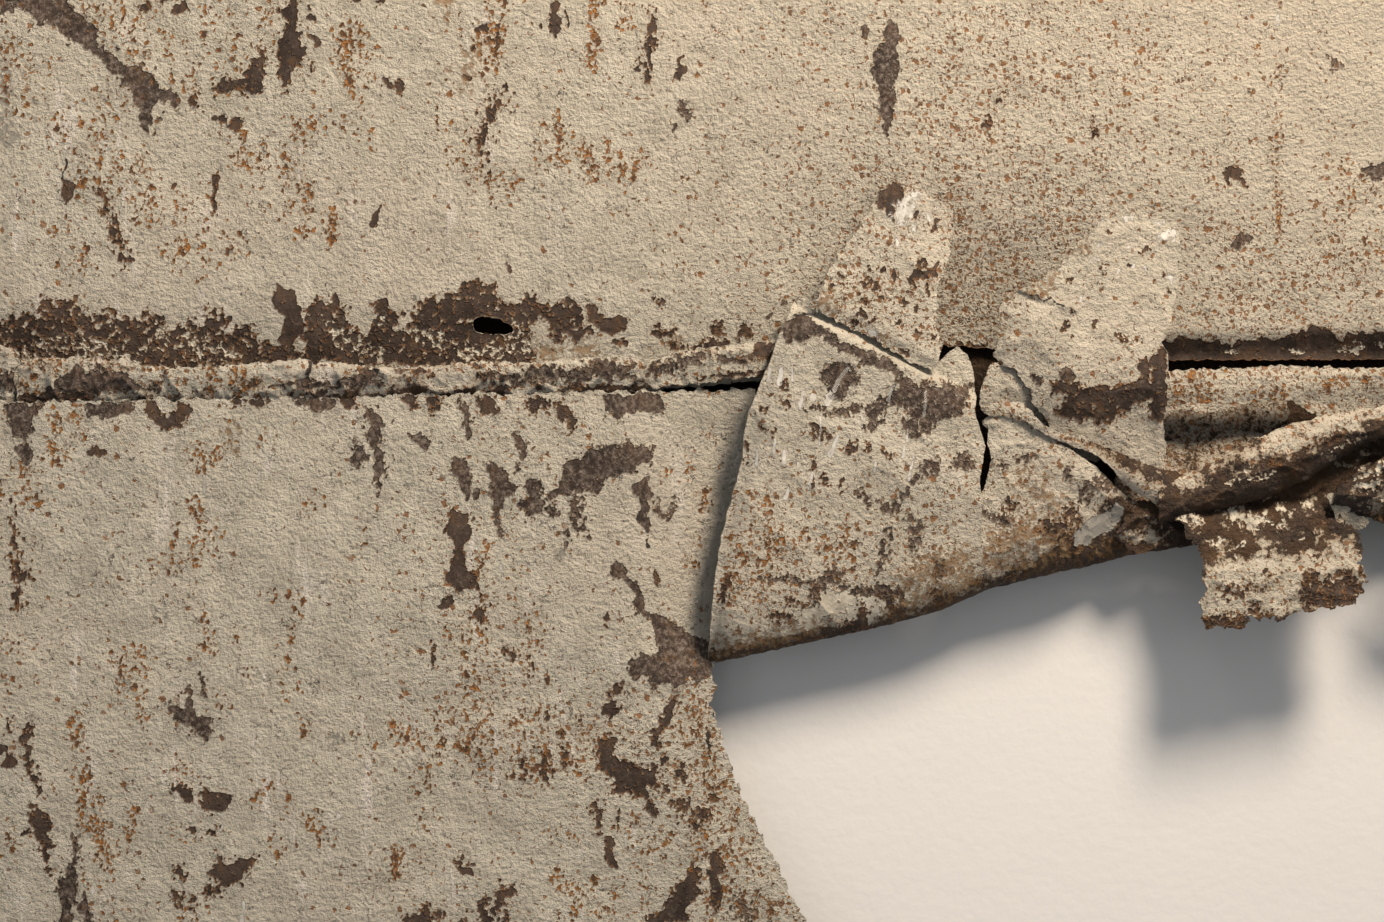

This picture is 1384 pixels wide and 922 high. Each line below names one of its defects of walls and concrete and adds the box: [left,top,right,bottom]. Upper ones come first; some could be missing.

crack [304,361,312,382]
corrosion [0,0,974,701]
peeling [828,257,937,344]
corrosion [1030,325,1384,426]
peeling [1073,502,1124,547]
peeling [1176,500,1315,561]
peeling [1353,459,1384,510]
peeling [764,588,889,638]
corrosion [163,603,254,789]
corrosion [358,438,1132,922]
corrosion [0,710,142,922]
corrosion [168,778,337,922]